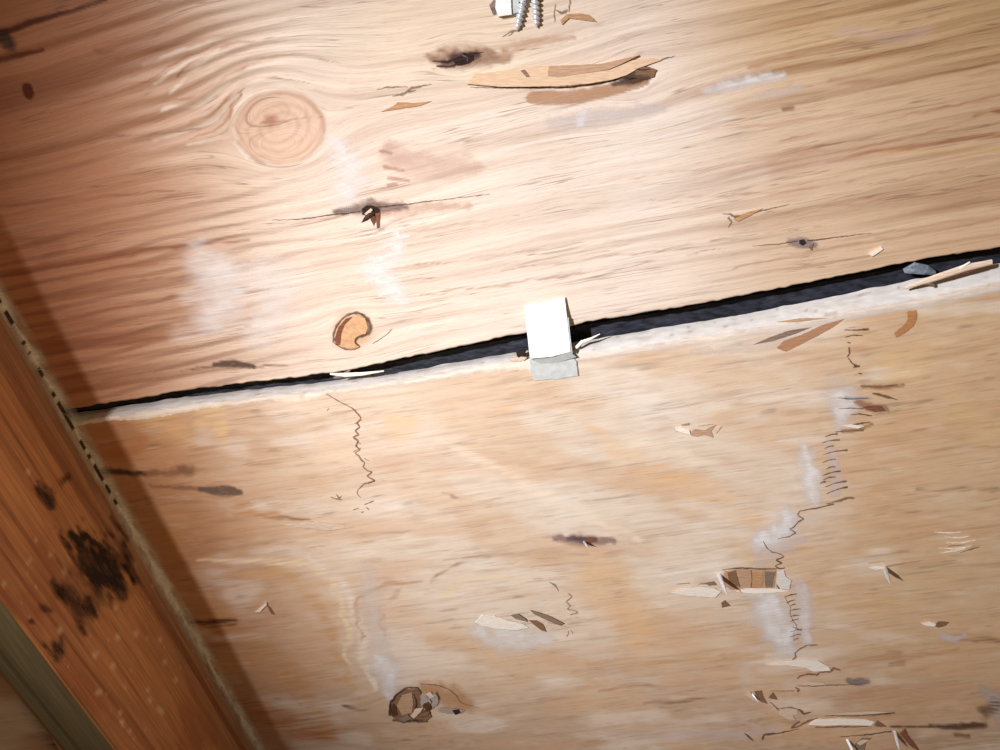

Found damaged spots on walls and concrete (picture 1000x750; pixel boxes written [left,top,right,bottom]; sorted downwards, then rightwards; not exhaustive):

peeling [547,55,639,78]
crack [327,394,375,513]
damp [36,486,54,509]
damp [52,525,136,635]
peeling [727,570,776,588]
crack [725,568,780,590]
crack [744,667,894,740]